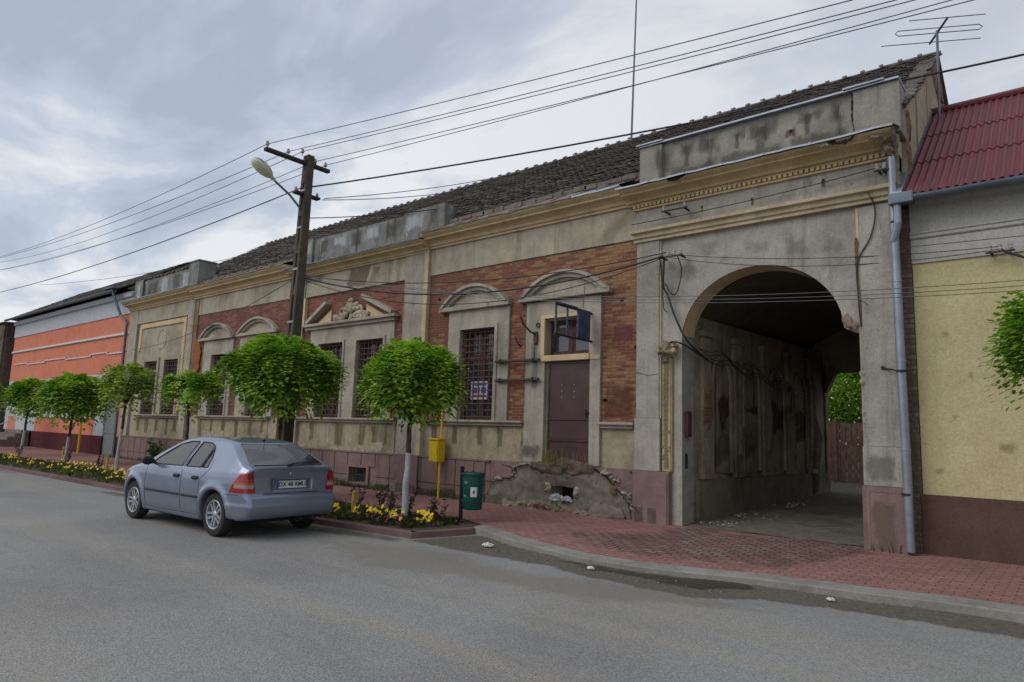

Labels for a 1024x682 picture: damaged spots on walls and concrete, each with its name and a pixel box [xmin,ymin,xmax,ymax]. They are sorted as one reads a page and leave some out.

crack [849,94,857,132]
flaking render [842,313,860,333]
flaking render [485,460,632,520]